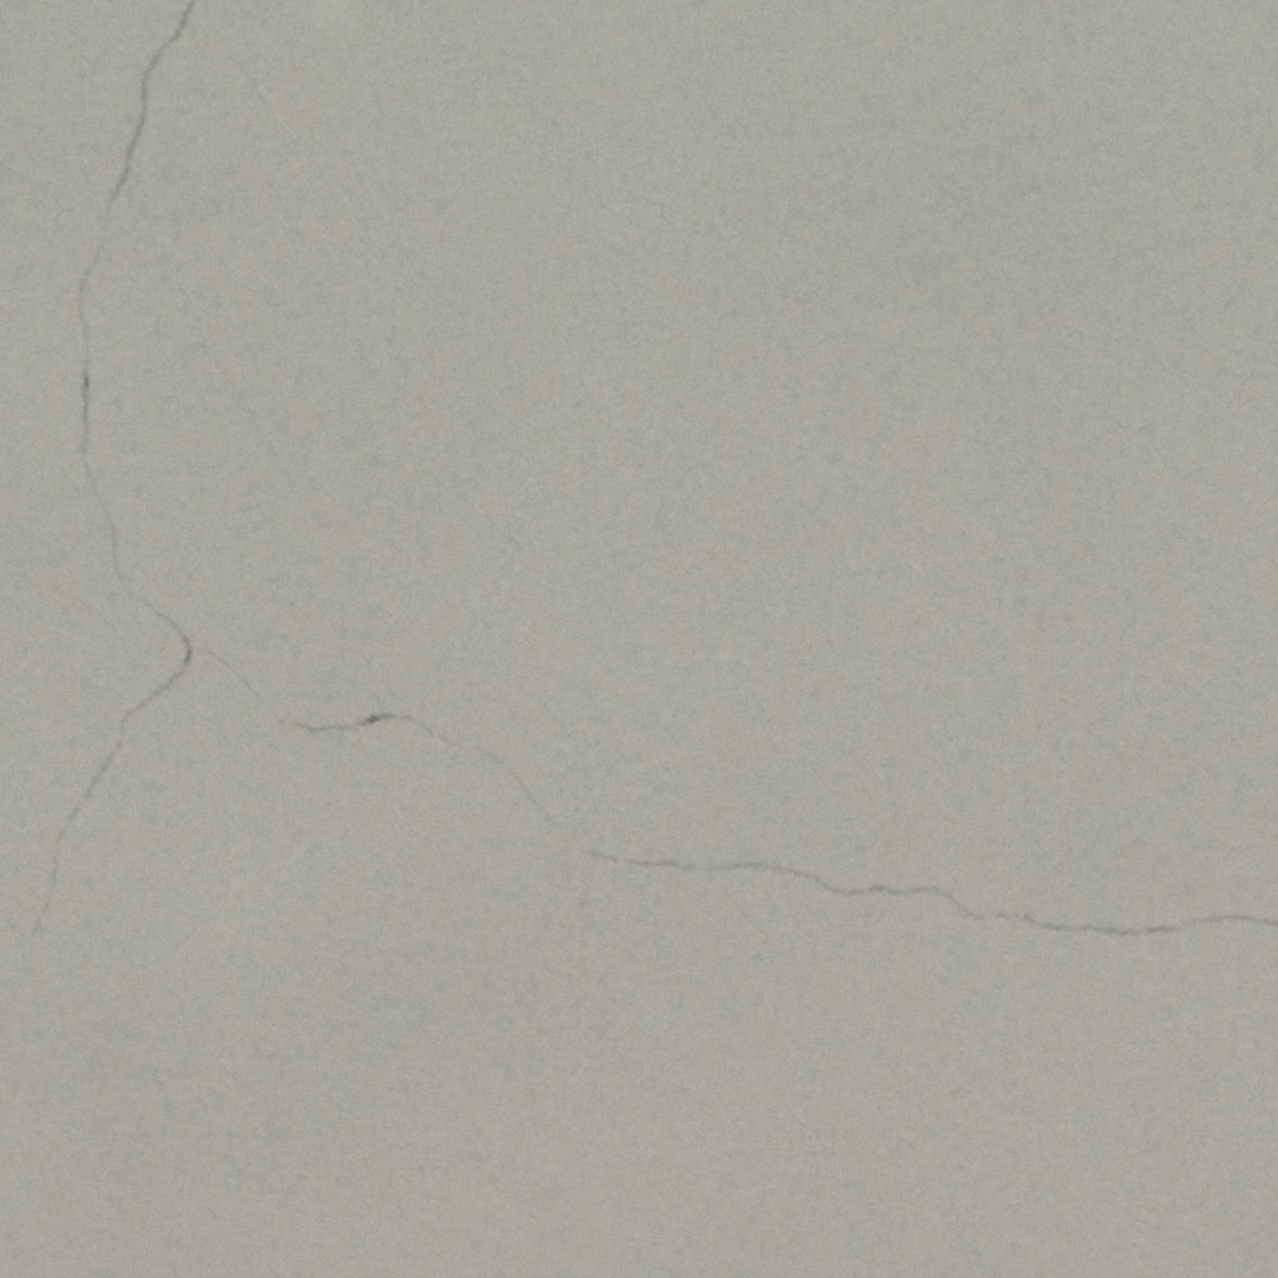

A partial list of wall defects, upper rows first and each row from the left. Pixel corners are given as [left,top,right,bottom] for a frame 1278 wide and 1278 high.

crack [25,0,1278,971]